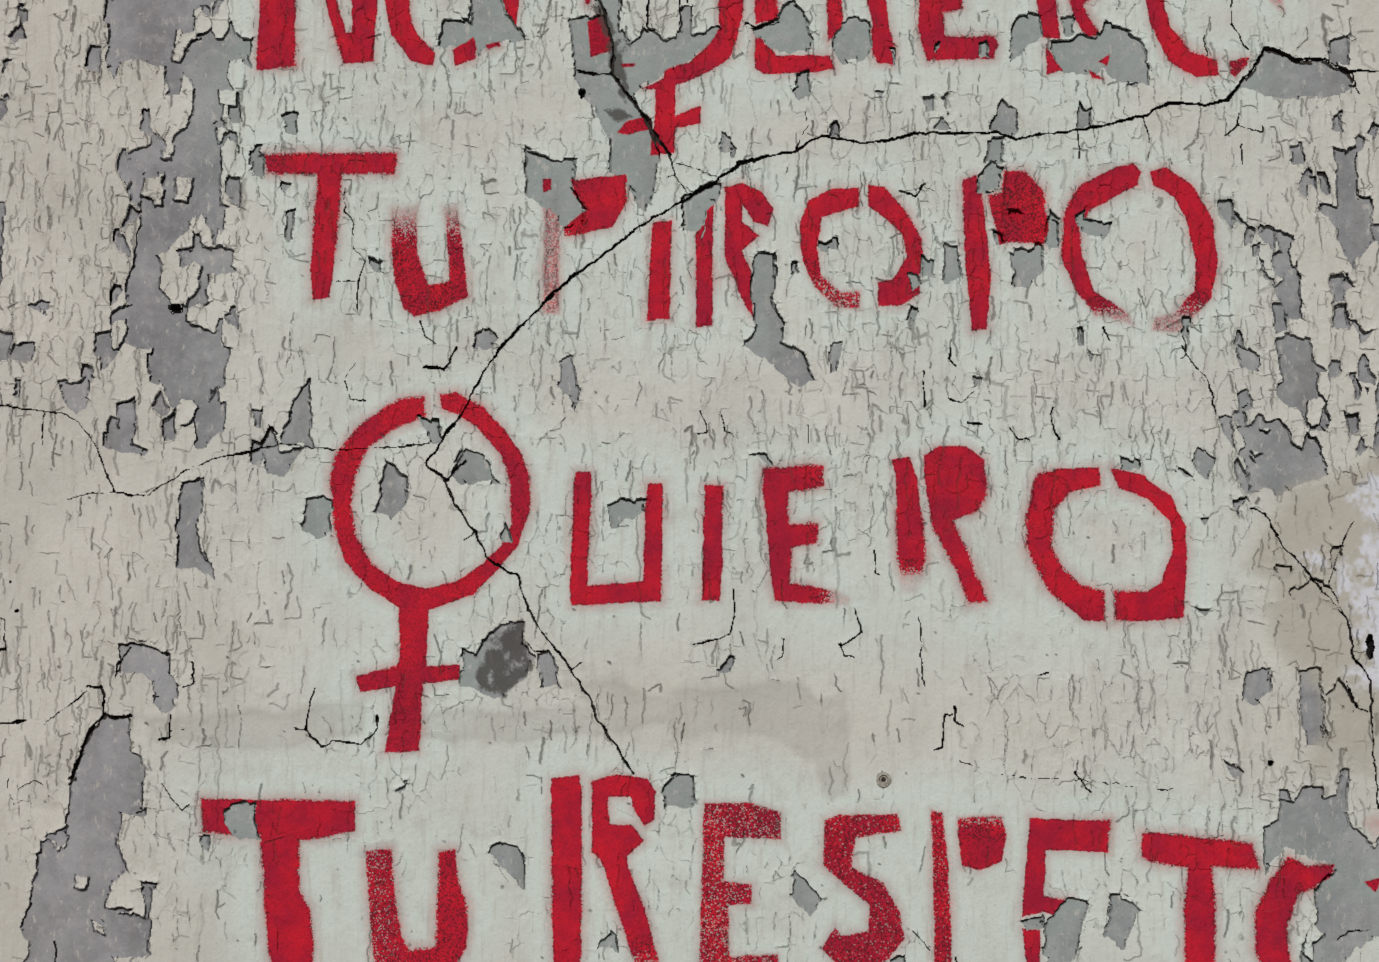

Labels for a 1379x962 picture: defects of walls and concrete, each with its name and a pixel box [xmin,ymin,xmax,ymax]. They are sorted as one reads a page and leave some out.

peeling [55,0,318,481]
crack [0,404,432,500]
crack [419,320,458,371]
peeling [520,142,587,237]
peeling [563,0,721,219]
crack [425,0,1379,809]
peeling [1166,28,1379,536]
crack [0,644,133,805]
crack [294,688,379,748]
water stain [1233,453,1379,786]
peeling [16,707,160,962]
peeling [1259,763,1379,962]